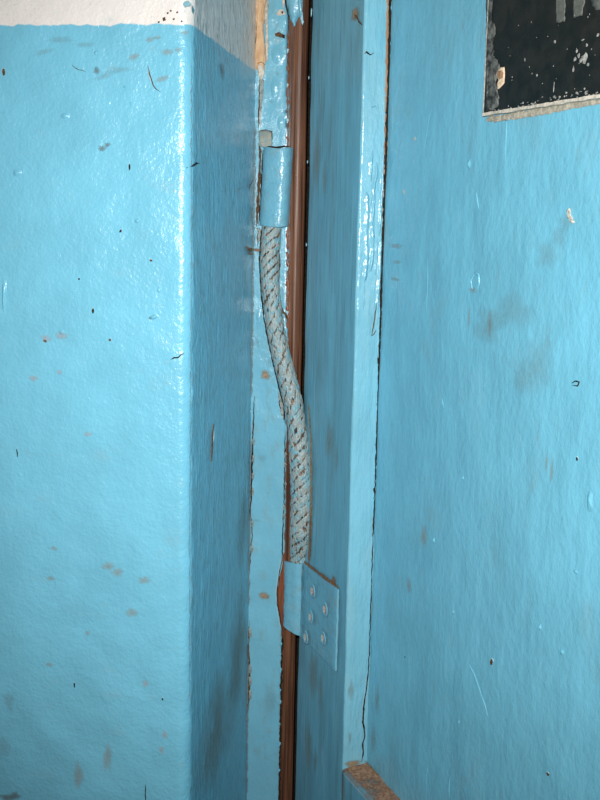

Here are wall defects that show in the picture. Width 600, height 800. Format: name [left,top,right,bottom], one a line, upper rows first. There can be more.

flaking render [255,0,312,148]
crack [360,0,392,762]
crack [248,396,256,570]
crack [245,627,253,709]